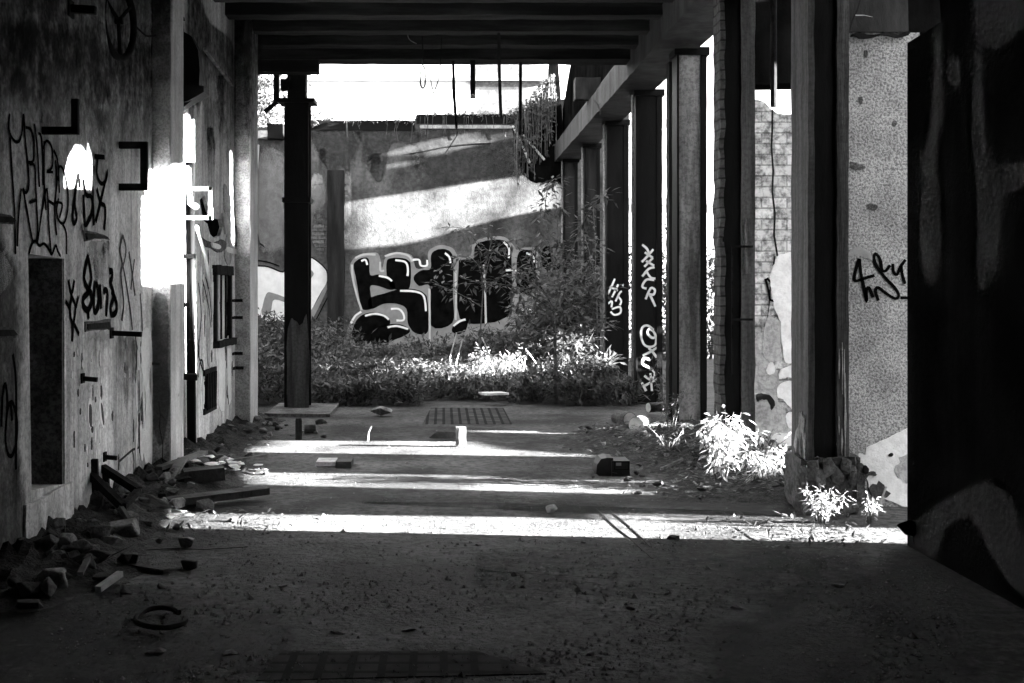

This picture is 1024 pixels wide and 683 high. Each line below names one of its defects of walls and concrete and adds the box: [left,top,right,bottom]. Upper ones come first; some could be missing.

peeling [838,343,907,507]